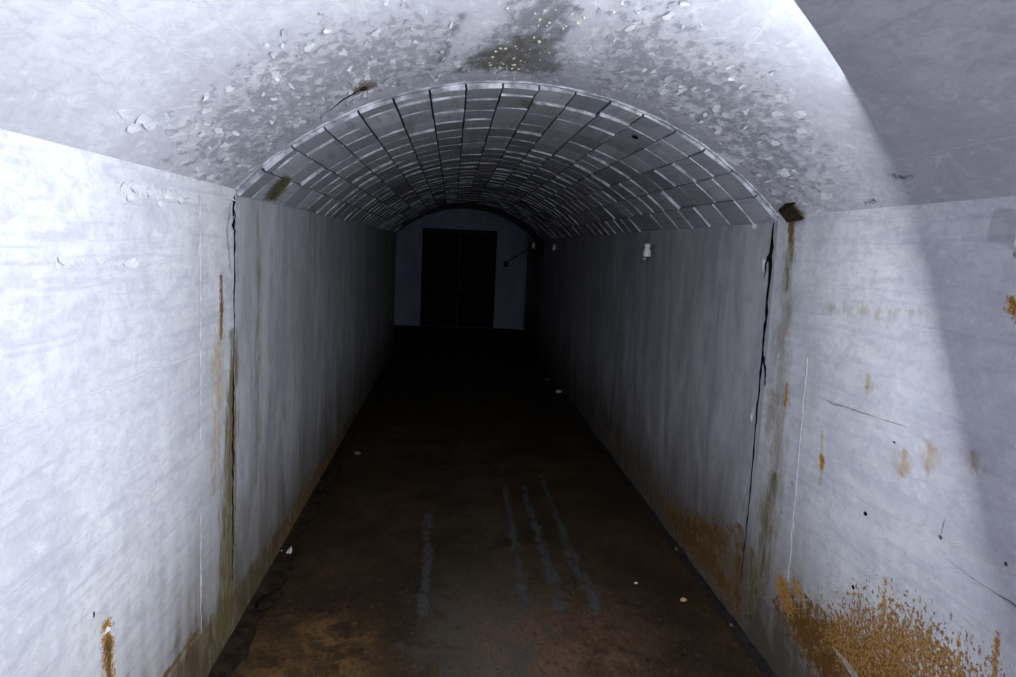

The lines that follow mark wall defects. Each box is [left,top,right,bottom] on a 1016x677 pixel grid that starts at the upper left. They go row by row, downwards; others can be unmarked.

peeling [225,1,418,152]
damp [455,0,586,79]
peeling [118,89,245,167]
peeling [604,34,859,206]
rust [1003,296,1016,324]
damp [163,409,356,677]
rust [101,617,116,677]
rust [771,566,1012,677]
crack [947,559,1016,608]